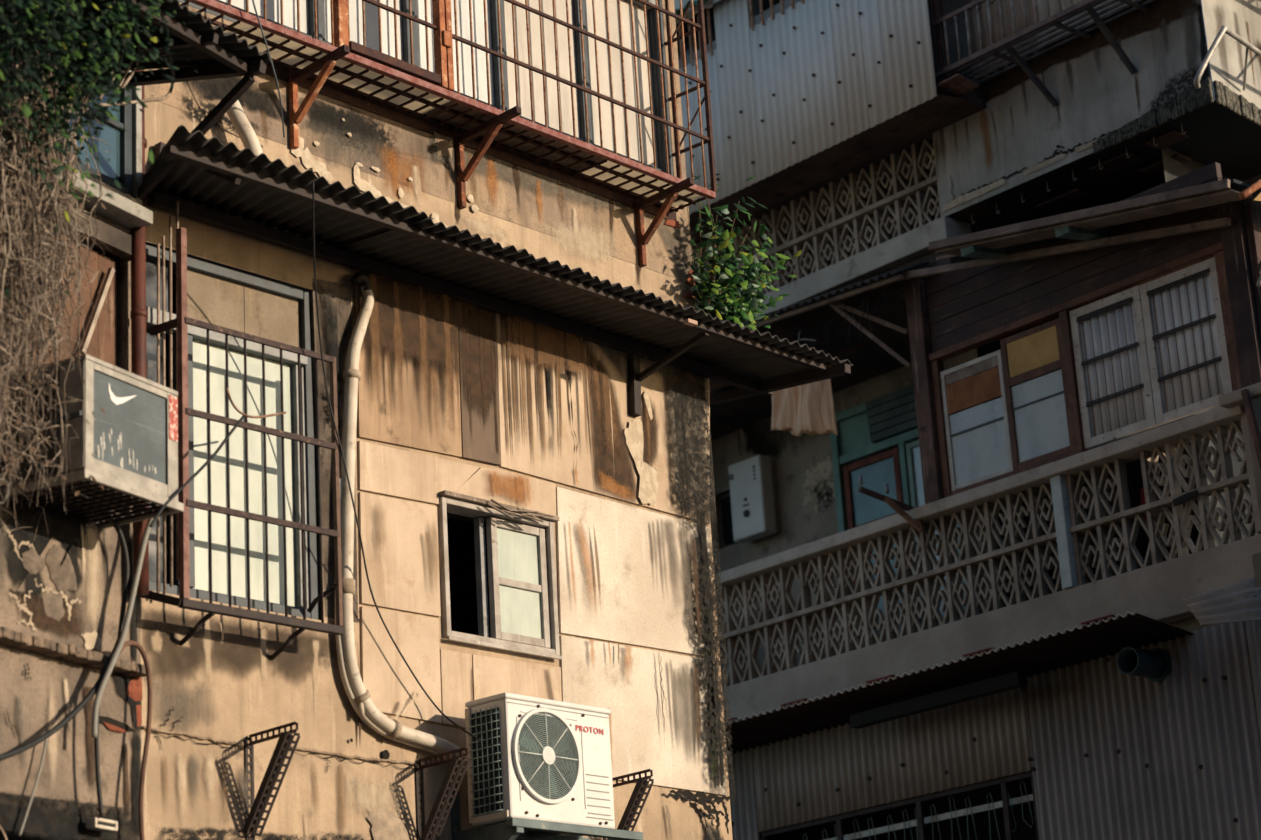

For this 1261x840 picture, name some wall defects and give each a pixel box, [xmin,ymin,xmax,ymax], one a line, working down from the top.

mould [183,77,279,135]
damp [308,102,399,165]
peeling [586,344,659,505]
rust [492,471,530,501]
peeling [4,526,35,559]
damp [364,270,736,794]
rust [569,524,600,597]
peeling [8,578,82,632]
damp [130,536,326,726]
damp [49,680,70,763]
damp [161,828,245,840]
damp [260,766,390,840]